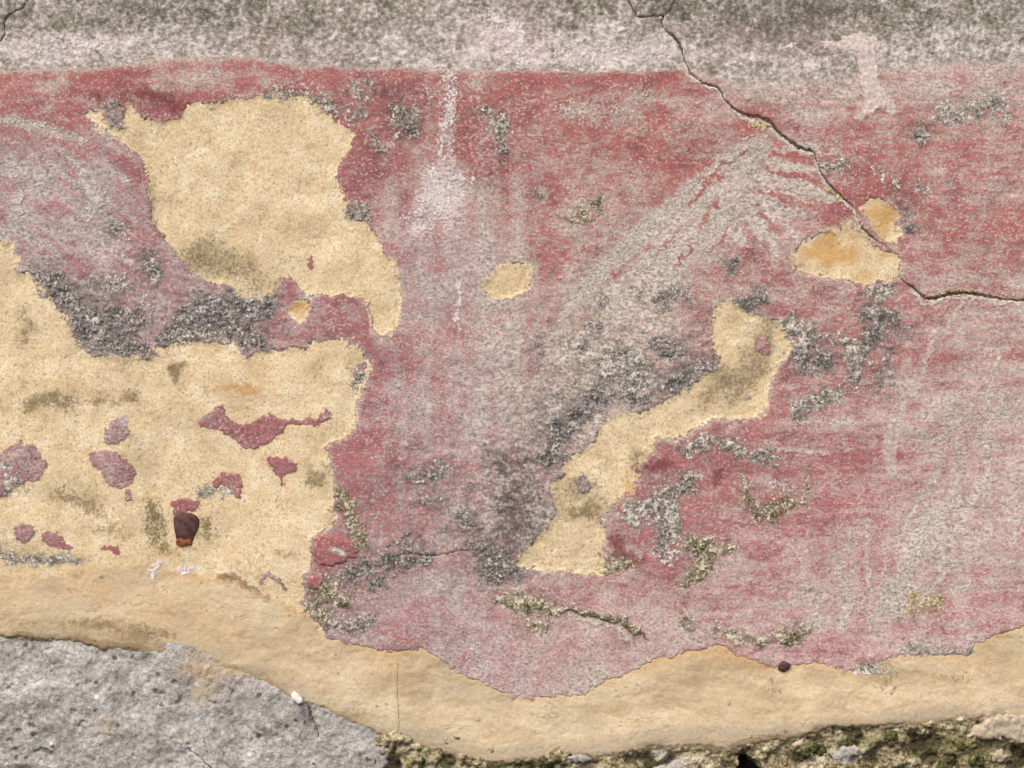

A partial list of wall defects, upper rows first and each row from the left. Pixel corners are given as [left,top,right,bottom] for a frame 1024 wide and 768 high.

spalling [85,91,403,344]
spalling [480,261,535,300]
crack [628,0,1024,307]
spalling [788,198,904,286]
spalling [0,238,373,643]
spalling [511,299,793,577]